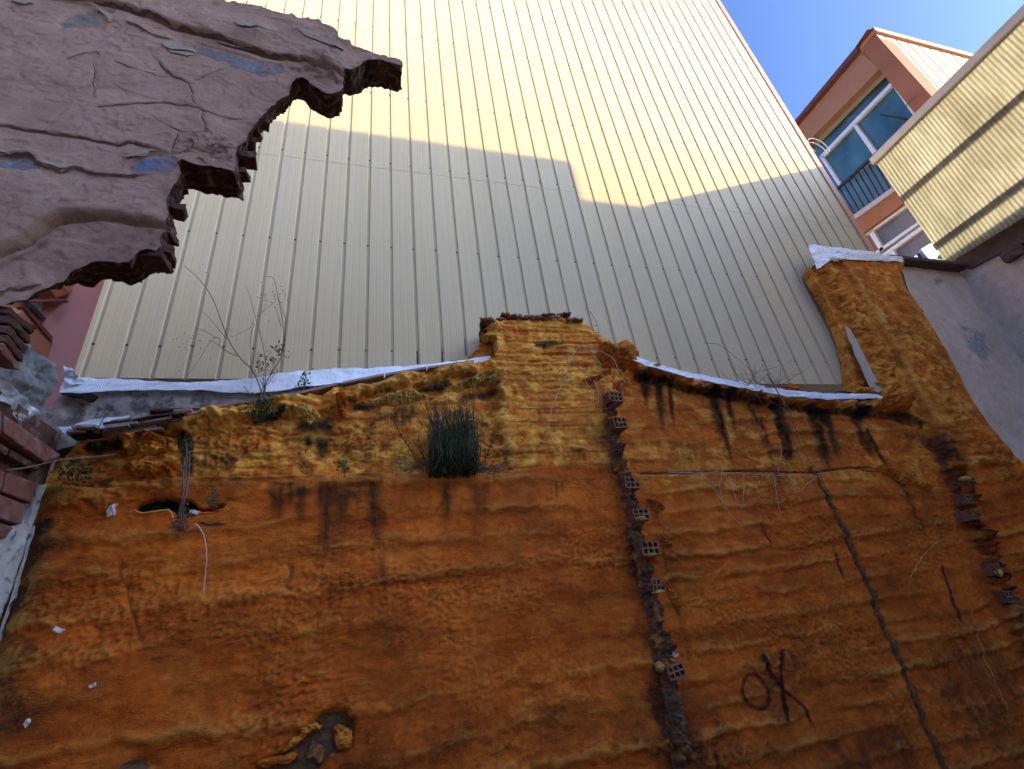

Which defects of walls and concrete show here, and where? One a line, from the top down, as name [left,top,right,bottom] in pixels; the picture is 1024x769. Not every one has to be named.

peeling [161,28,279,76]
crack [0,1,320,177]
peeling [0,148,74,170]
spalling [238,117,270,183]
spalling [137,202,188,273]
damp [634,370,923,460]
damp [272,482,378,535]
crack [640,466,949,769]
crack [942,565,963,623]
spalling [257,711,353,769]